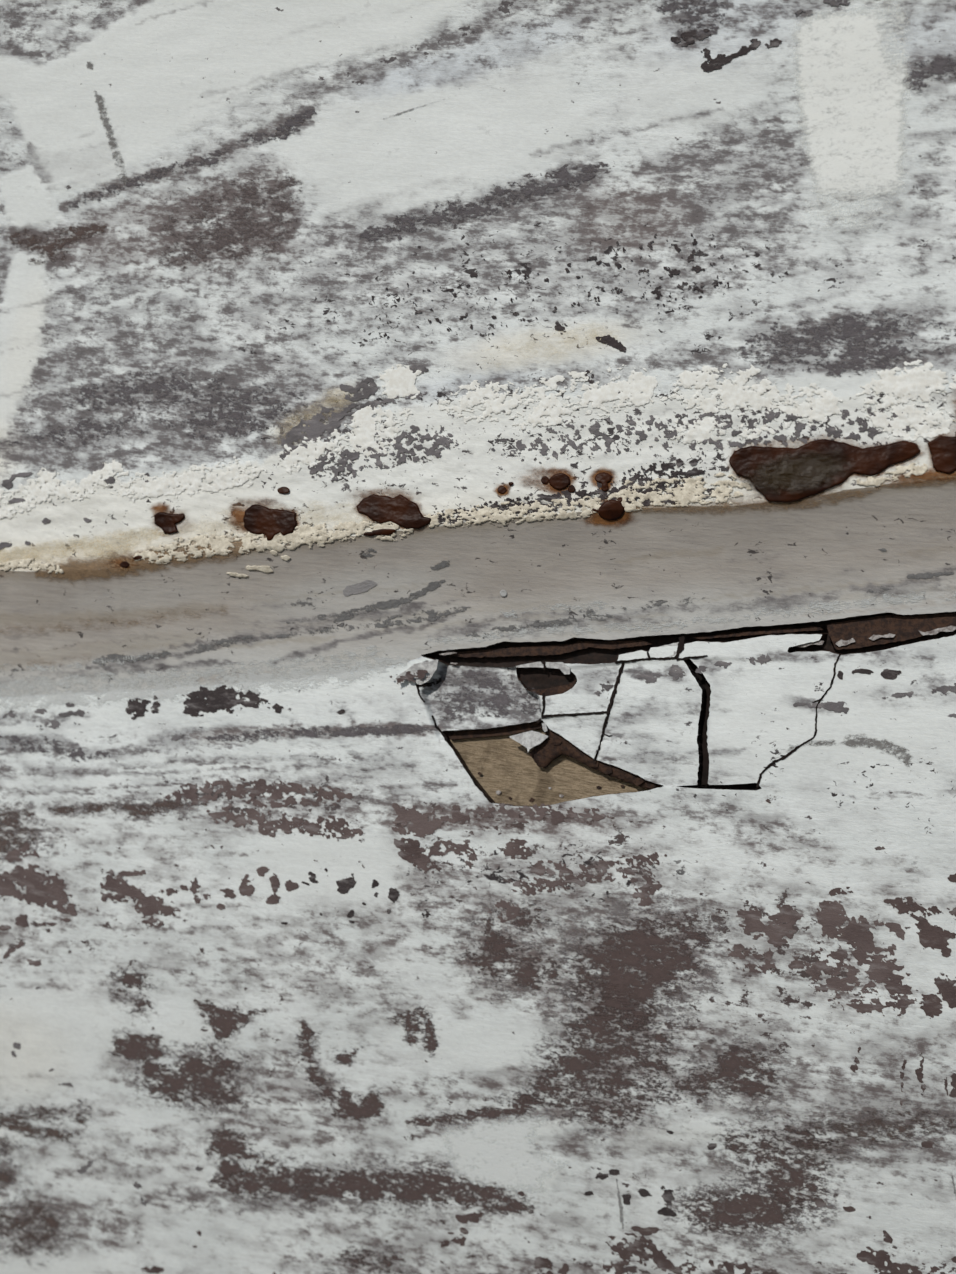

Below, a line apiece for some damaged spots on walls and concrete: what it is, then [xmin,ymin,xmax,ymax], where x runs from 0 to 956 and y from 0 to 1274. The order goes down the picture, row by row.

corrosion [231,487,299,541]
corrosion [356,491,431,536]
corrosion [586,469,631,526]
water stain [634,476,956,513]
corrosion [729,433,956,503]
water stain [35,538,248,581]
peeling [182,685,283,717]
spalling [206,611,956,878]
crack [537,636,841,791]
peeling [0,777,363,966]
peeling [406,838,956,1274]
peeling [112,1000,535,1247]